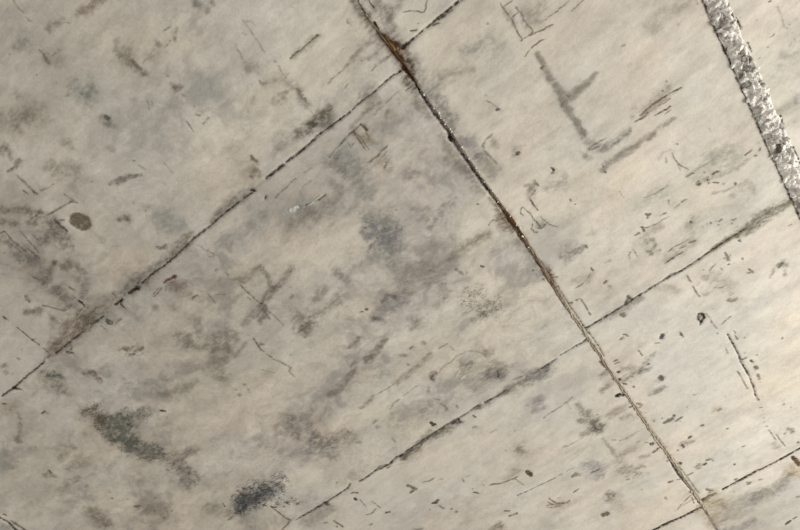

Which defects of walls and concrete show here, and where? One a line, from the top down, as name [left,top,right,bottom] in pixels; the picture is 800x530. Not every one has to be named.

corrosion [378,33,413,69]
damp [97,413,192,463]
damp [231,474,298,515]